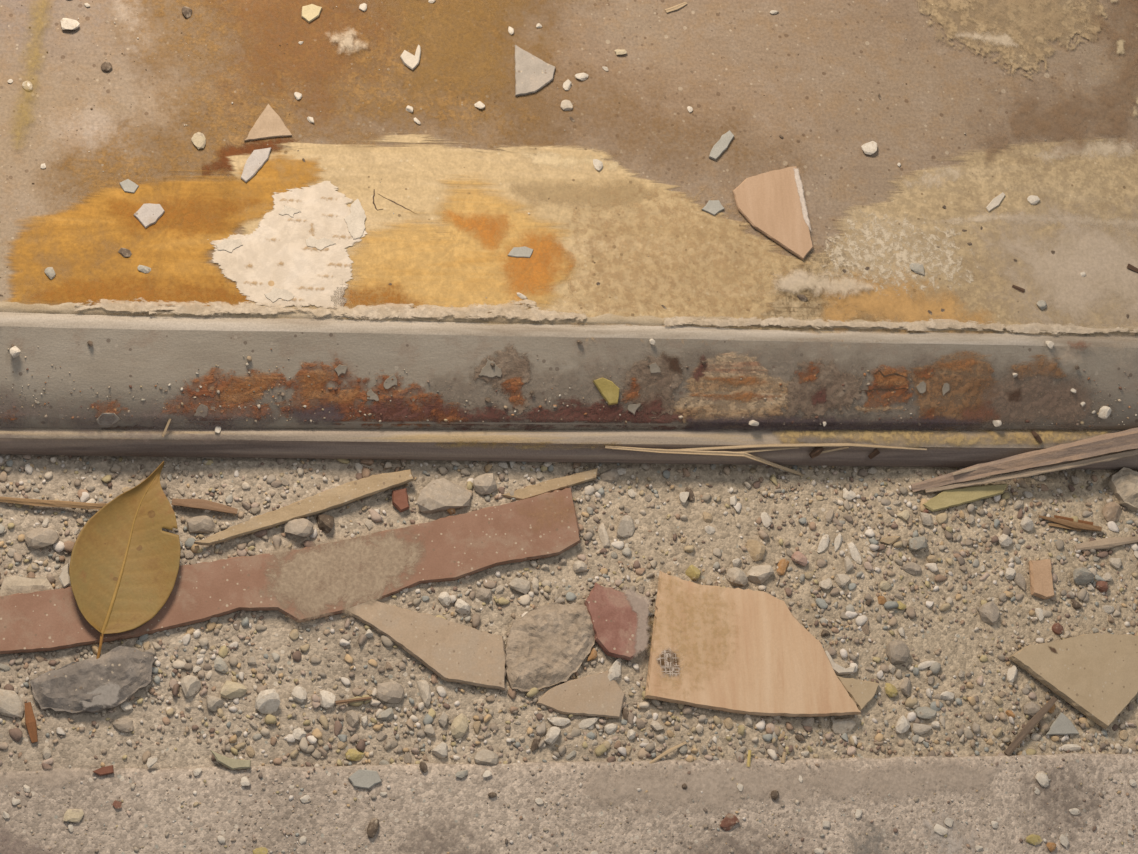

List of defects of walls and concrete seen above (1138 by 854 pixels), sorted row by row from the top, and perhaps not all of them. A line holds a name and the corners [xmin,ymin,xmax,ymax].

peeling [918,0,1107,79]
peeling [211,104,1138,339]